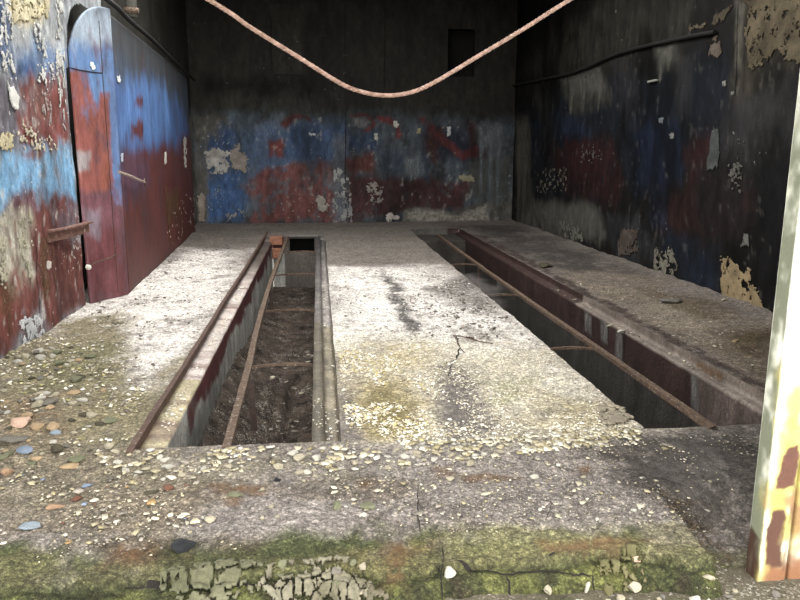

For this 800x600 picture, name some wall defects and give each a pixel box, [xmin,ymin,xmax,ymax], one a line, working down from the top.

peeling [743,0,800,71]
peeling [0,0,68,152]
peeling [200,135,249,175]
peeling [706,127,720,171]
peeling [309,168,353,223]
damp [382,276,421,331]
spalling [0,182,764,563]
crack [441,336,465,379]
spalling [159,524,389,600]
crack [420,547,595,600]